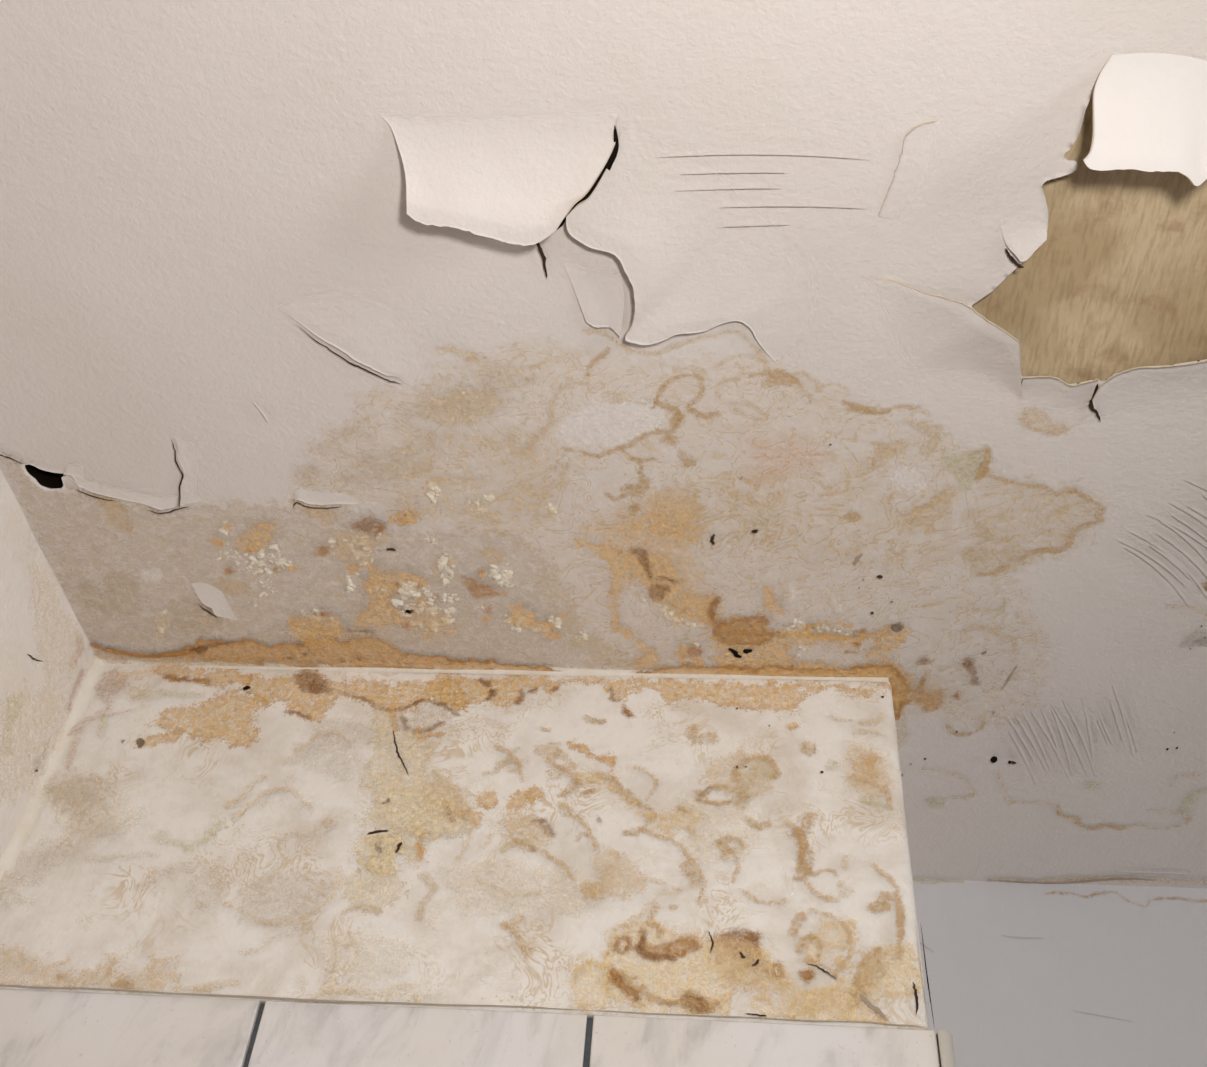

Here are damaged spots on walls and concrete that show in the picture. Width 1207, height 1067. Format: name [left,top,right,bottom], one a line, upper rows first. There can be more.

crack [536,126,619,278]
peeling [382,113,811,362]
peeling [278,297,423,387]
peeling [0,436,202,514]
peeling [293,487,364,509]
damp [561,374,718,511]
damp [22,477,619,668]
damp [758,619,871,670]
damp [352,769,460,877]
damp [508,729,783,914]
damp [787,812,922,1024]